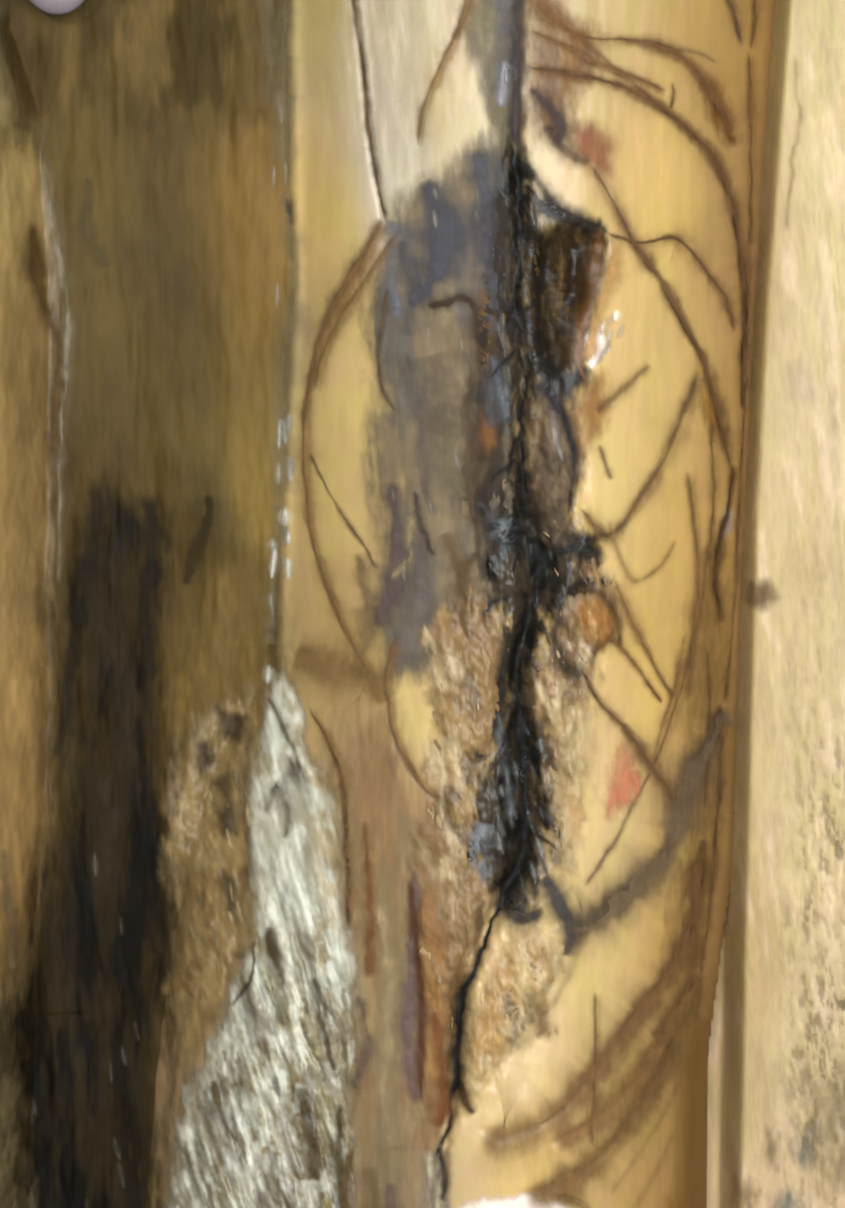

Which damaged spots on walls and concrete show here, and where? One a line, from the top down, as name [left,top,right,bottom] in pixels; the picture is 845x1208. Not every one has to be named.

leakage [2,0,272,123]
peeling [273,0,291,183]
crack [418,0,466,137]
rust [531,26,610,170]
leakage [0,475,278,1208]
spalling [165,593,363,1208]
peeling [272,510,290,576]
leakage [355,0,611,905]
spalling [410,587,565,1081]
spalling [533,437,622,872]
crack [438,0,757,1201]
peeling [424,1152,573,1208]